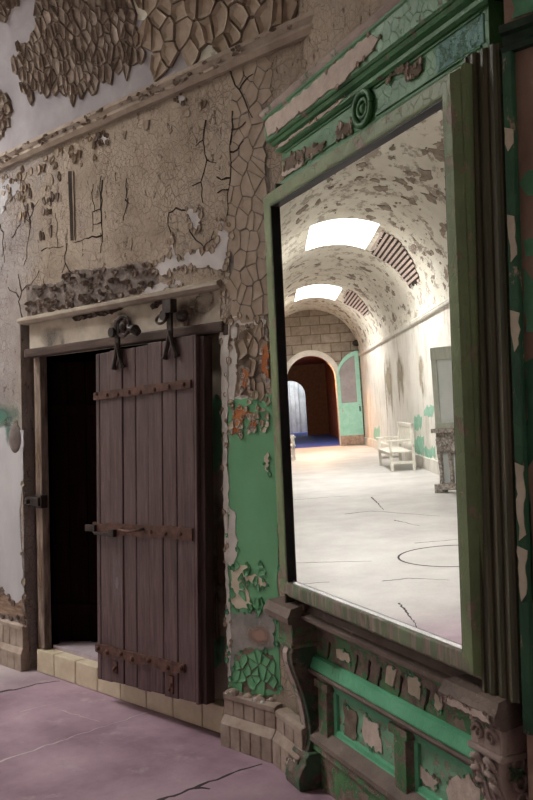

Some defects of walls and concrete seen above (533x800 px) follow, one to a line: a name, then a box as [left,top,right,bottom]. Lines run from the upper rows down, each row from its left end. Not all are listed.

peeling [0,0,300,164]
peeling [0,130,110,241]
crack [0,173,129,318]
peeling [24,217,235,321]
crack [167,56,273,402]
peeling [504,128,514,151]
peeling [507,215,517,262]
peeling [510,310,521,352]
peeling [215,312,283,704]
peeling [515,462,528,601]
flaking render [0,578,28,627]